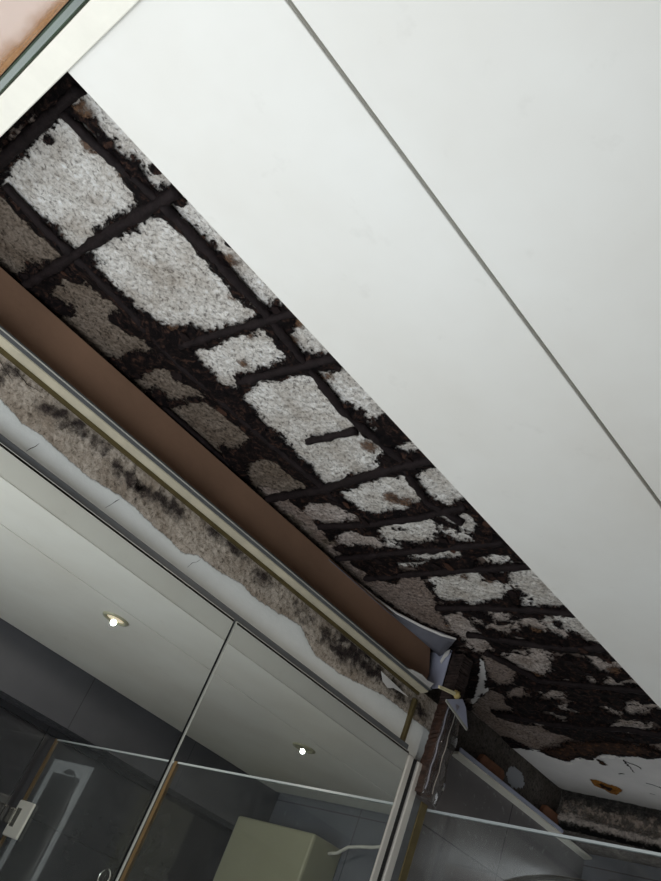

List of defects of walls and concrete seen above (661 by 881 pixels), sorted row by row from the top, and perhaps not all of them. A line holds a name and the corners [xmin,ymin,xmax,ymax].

corrosion [0,72,81,148]
spalling [0,83,282,332]
spalling [47,278,154,361]
damp [38,404,183,519]
spalling [132,366,251,472]
corrosion [0,98,661,766]
peeling [0,399,429,762]
damp [207,527,245,558]
spalling [178,309,661,811]
corrosion [590,779,622,795]
damp [558,821,661,853]
damp [562,789,661,819]